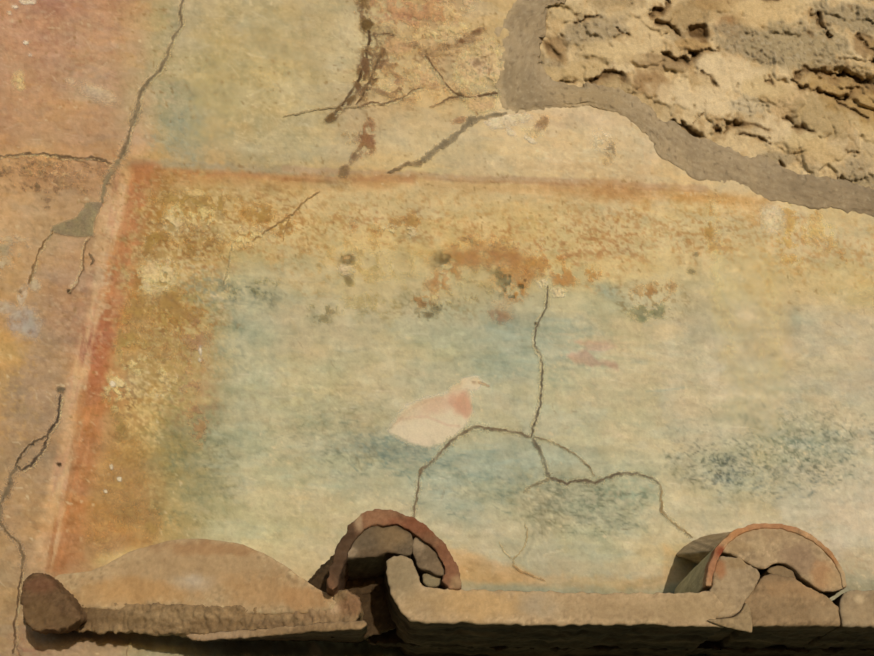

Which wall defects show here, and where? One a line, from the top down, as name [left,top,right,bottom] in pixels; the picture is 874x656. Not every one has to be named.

crack [0,0,184,203]
crack [283,16,508,173]
spalling [540,0,874,190]
crack [70,237,95,293]
crack [412,286,693,538]
crack [0,394,63,656]
crack [499,524,545,581]